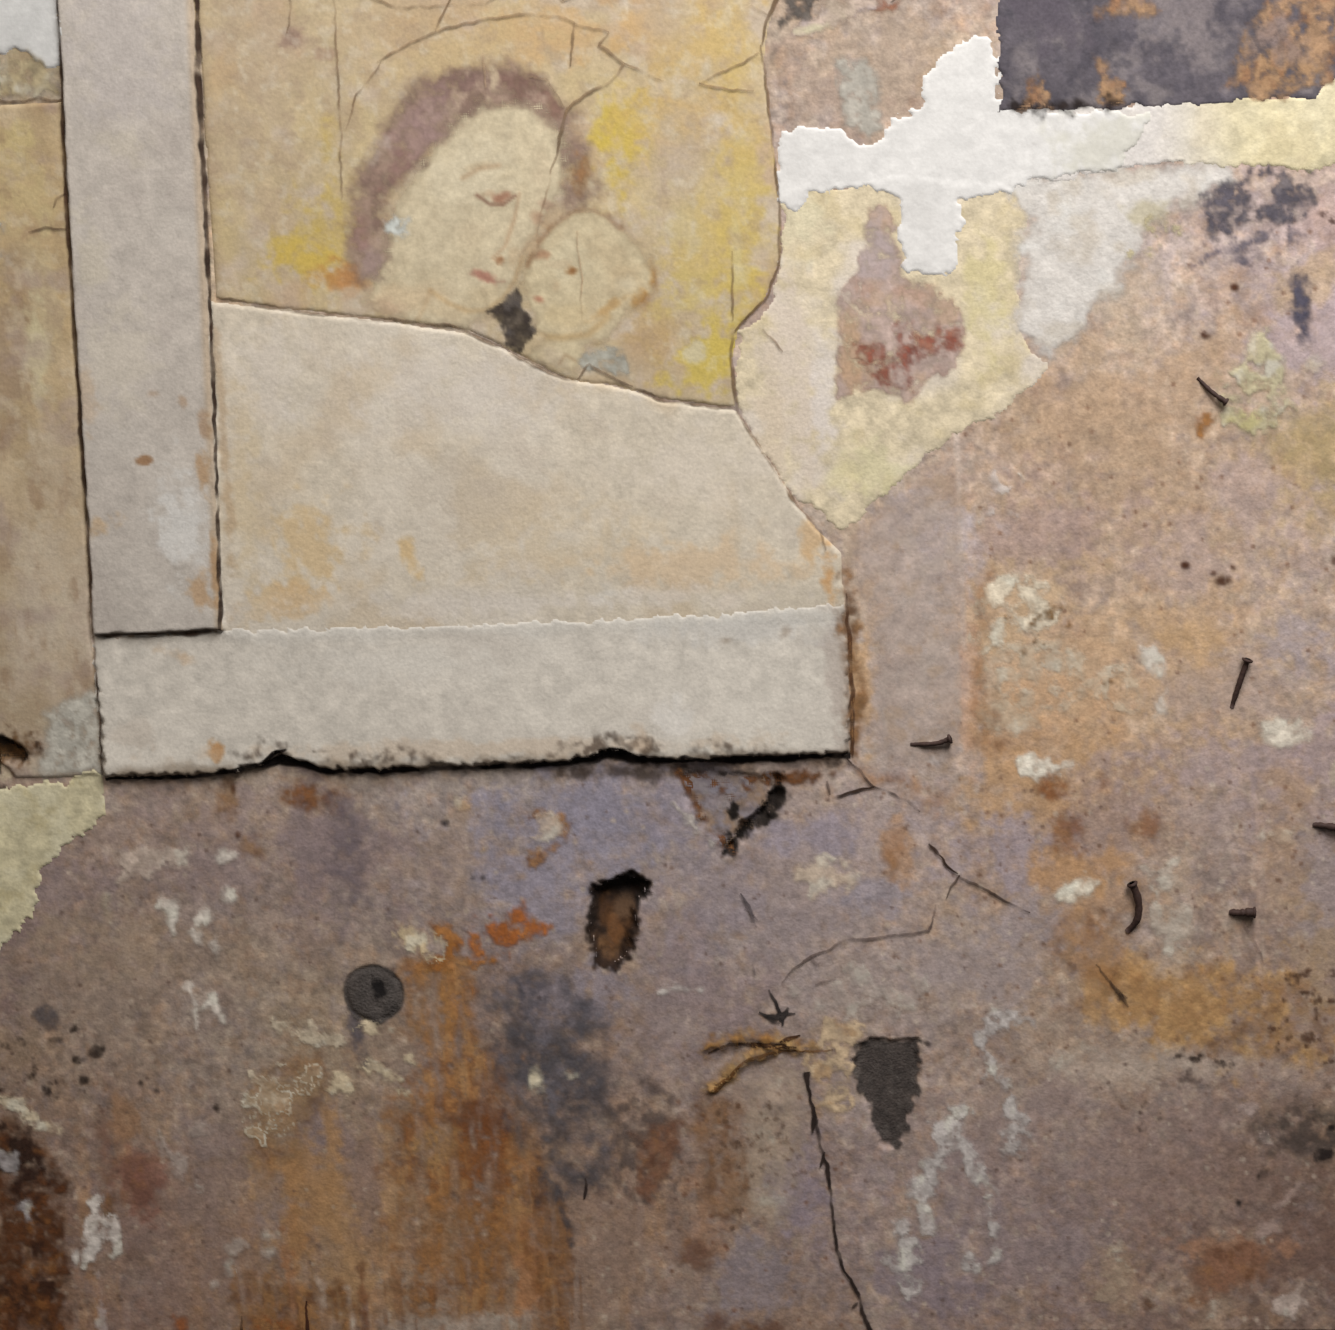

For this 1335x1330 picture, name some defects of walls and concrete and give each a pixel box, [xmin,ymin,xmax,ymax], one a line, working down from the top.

crack [0,1,91,596]
crack [92,0,319,637]
crack [390,162,781,432]
peeling [735,0,1335,530]
peeling [0,101,106,950]
crack [95,593,896,798]
rust [419,908,552,973]
spalling [586,870,650,972]
rust [0,1115,71,1330]
rust [232,1268,367,1330]
crack [708,990,872,1330]
spalling [802,1016,930,1149]